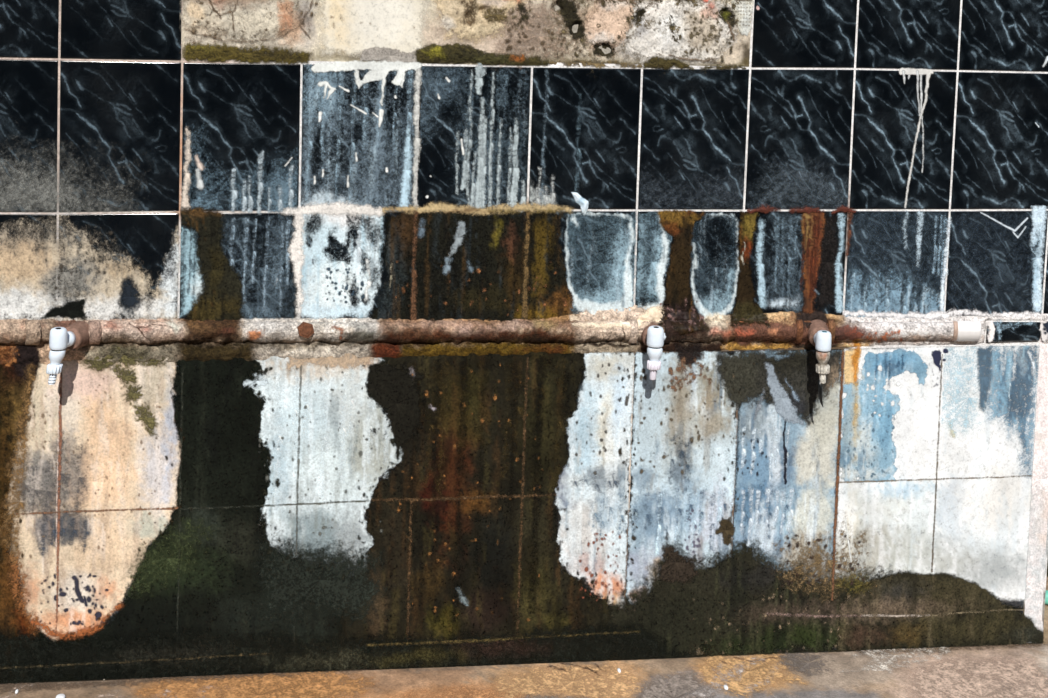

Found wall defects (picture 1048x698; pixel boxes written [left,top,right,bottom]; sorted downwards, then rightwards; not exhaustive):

flaking render [181,0,382,62]
flaking render [420,0,657,66]
flaking render [662,0,759,69]
damp [0,169,203,321]
damp [181,63,672,329]
corrosion [733,204,856,346]
damp [529,199,1048,614]
damp [0,358,185,640]
corrosion [31,604,121,639]